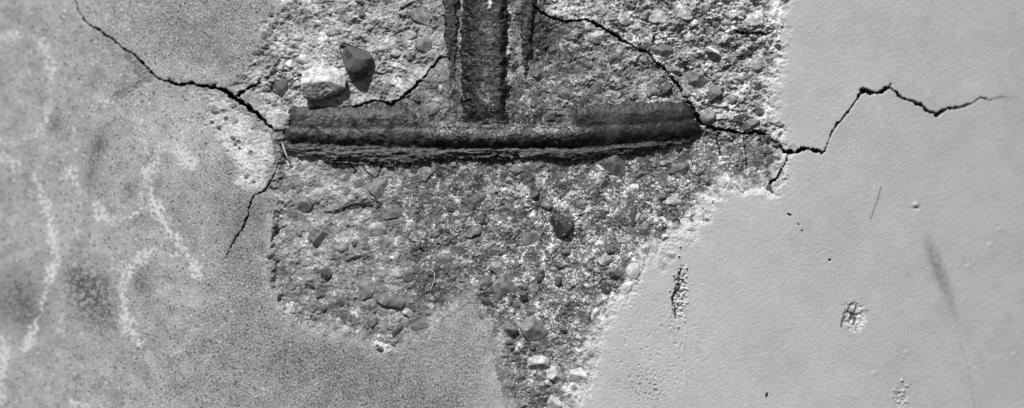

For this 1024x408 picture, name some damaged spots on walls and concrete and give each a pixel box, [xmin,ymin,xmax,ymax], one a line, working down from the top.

crack [75,1,274,130]
crack [353,56,442,107]
crack [535,7,987,185]
crack [227,163,279,255]
spalling [199,0,793,408]
peeling [841,297,873,334]